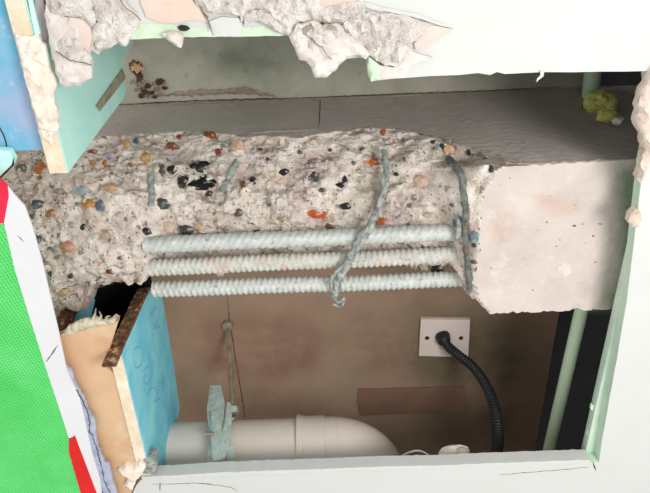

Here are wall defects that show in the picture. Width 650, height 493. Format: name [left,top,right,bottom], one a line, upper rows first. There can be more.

spalling [129,59,168,99]
peeling [44,0,453,88]
spalling [1,68,650,314]